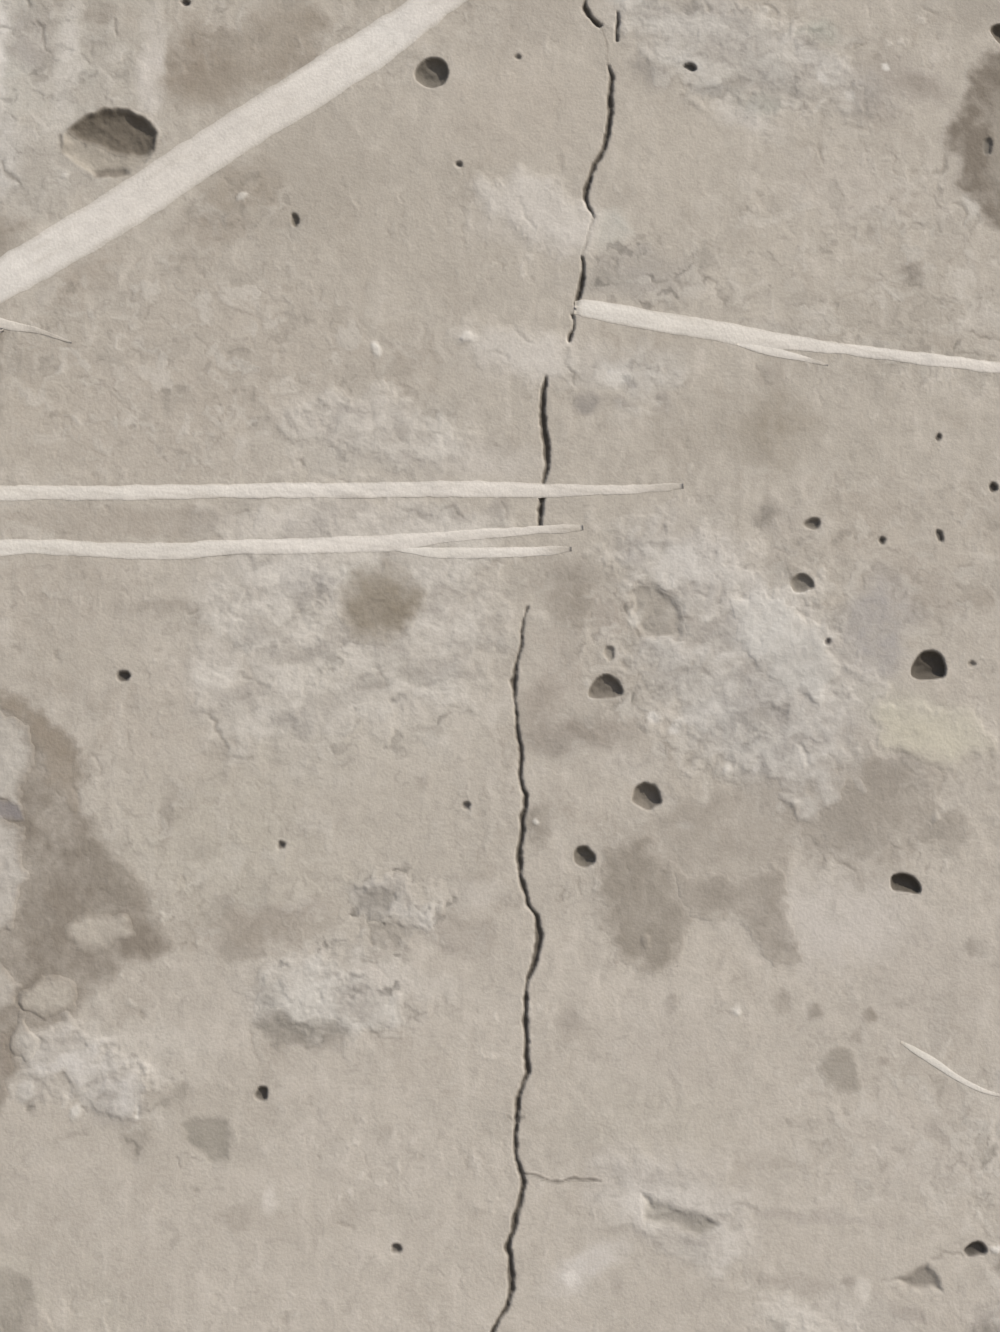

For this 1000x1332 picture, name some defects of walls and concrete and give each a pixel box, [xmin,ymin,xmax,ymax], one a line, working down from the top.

crack [566,0,621,343]
leakage [937,43,1000,235]
crack [534,375,553,526]
leakage [0,674,178,1120]
crack [487,605,604,1332]